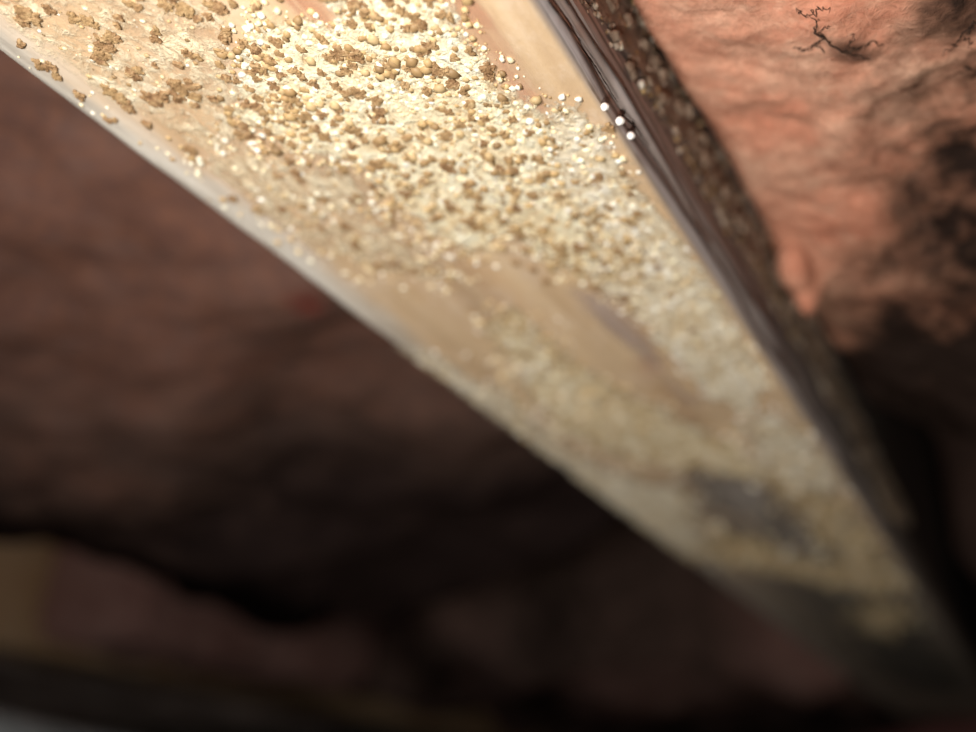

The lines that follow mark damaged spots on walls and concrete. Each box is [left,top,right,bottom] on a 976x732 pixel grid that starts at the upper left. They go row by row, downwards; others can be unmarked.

water stain [0,0,76,51]
water stain [29,58,63,82]
water stain [66,0,773,421]
water stain [580,0,910,526]
water stain [401,305,965,694]